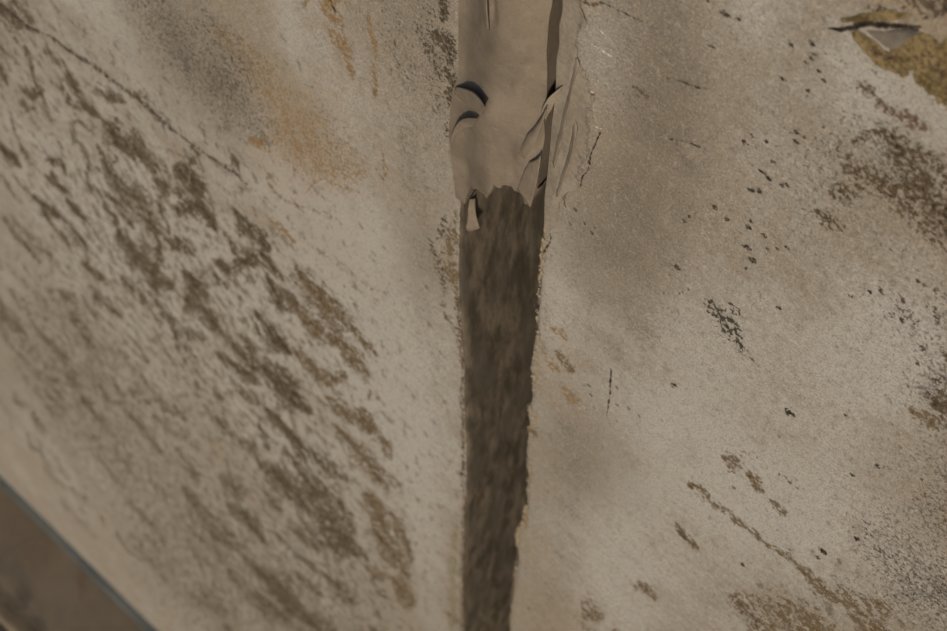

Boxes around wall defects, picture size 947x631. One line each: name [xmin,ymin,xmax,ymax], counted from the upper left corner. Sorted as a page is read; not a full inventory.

water stain [897,0,947,19]
peeling [827,4,947,111]
crack [0,2,276,208]
crack [564,132,601,207]
water stain [828,69,947,249]
water stain [0,0,417,631]
water stain [867,279,919,325]
crack [605,369,613,416]
water stain [909,362,947,431]
water stain [721,451,787,517]
water stain [675,522,701,552]
water stain [688,482,947,631]